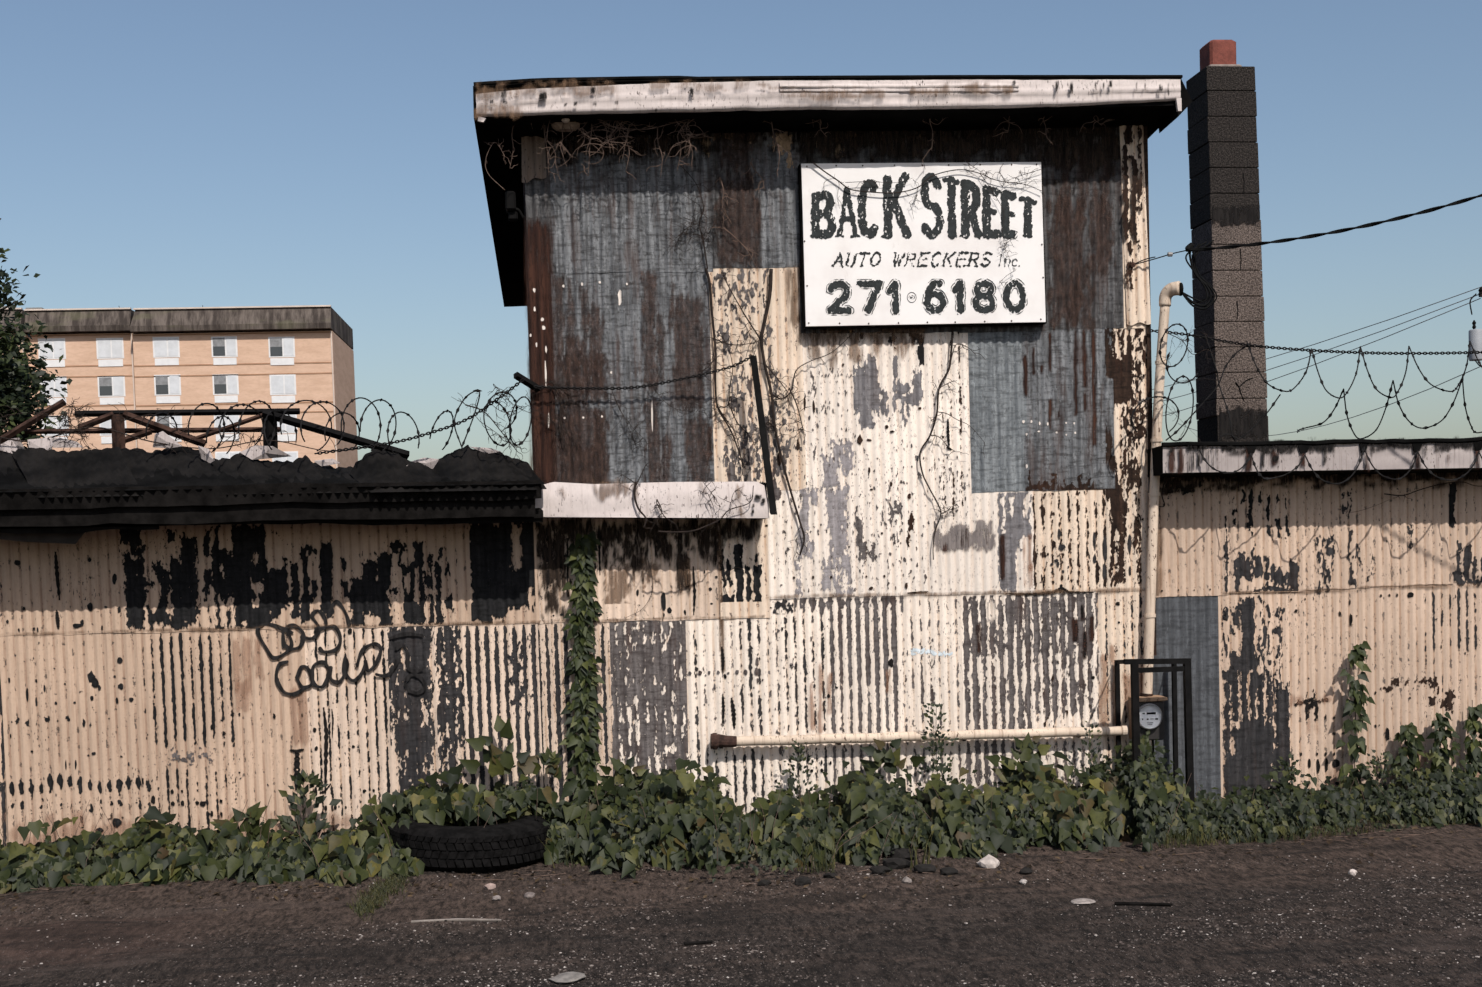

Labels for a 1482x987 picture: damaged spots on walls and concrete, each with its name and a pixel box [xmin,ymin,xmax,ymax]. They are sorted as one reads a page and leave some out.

corrosion [714,132,761,267]
peeling [0,522,573,846]
corrosion [525,218,609,484]
corrosion [641,271,713,483]
peeling [592,268,1144,811]
corrosion [1023,155,1142,593]
peeling [1130,328,1147,450]
corrosion [1169,447,1184,473]
corrosion [1227,445,1279,472]
peeling [1178,488,1377,803]